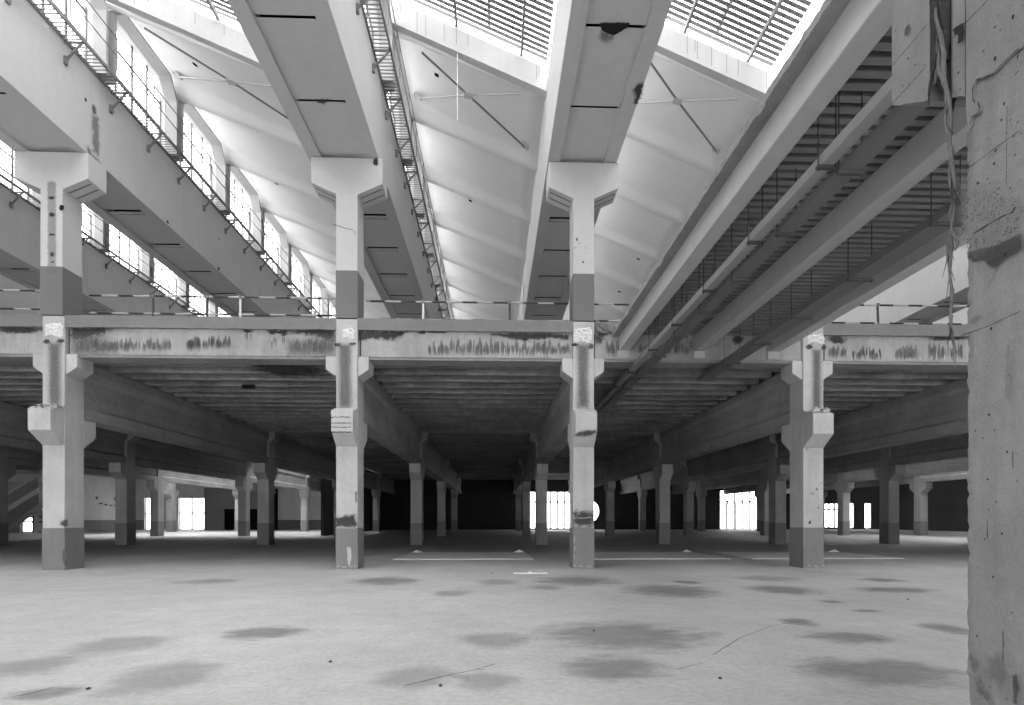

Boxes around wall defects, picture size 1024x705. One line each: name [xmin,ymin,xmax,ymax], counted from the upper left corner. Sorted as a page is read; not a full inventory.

spalling [586,22,642,35]
crack [970,48,1020,125]
damp [70,328,171,352]
damp [187,336,231,348]
damp [252,330,335,377]
damp [358,331,569,357]
spalling [807,334,825,344]
damp [829,336,963,361]